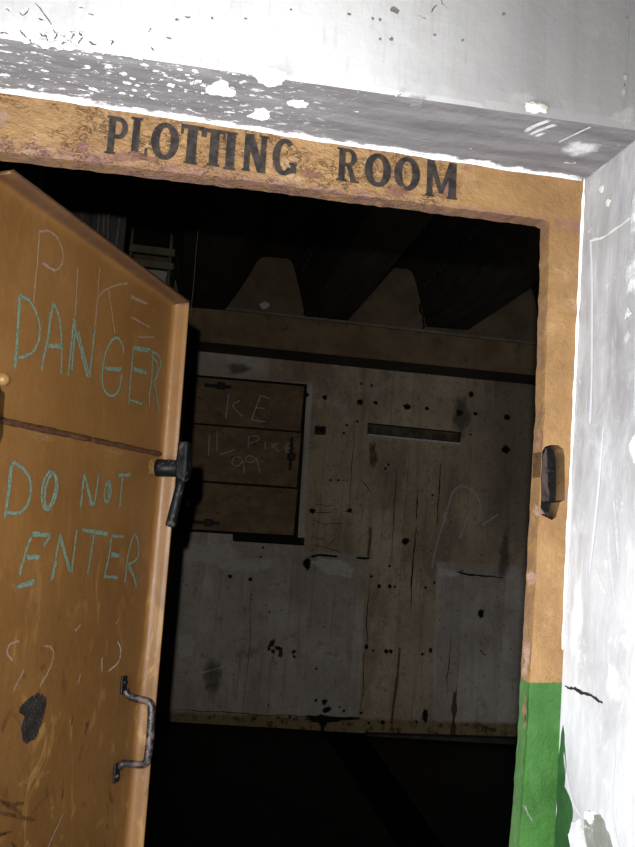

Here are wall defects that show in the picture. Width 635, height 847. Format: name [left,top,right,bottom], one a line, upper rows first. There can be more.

peeling [0,27,175,96]
peeling [151,46,243,97]
peeling [253,68,289,87]
peeling [287,100,309,108]
peeling [247,108,270,121]
crack [565,685,603,703]
peeling [554,727,613,847]